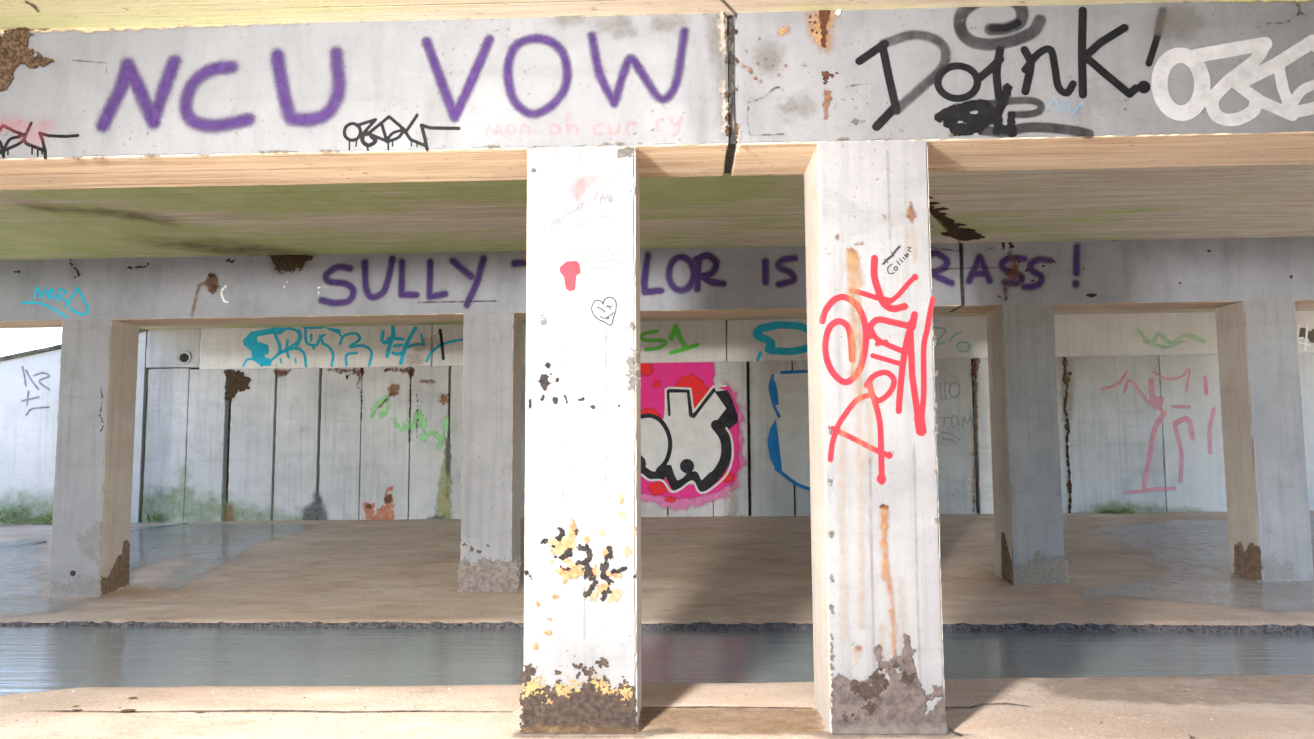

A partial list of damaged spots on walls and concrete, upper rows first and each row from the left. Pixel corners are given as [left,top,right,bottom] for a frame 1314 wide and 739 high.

corrosion [809,10,841,50]
spalling [0,27,53,91]
corrosion [821,71,838,118]
spalling [251,254,313,288]
spalling [224,369,251,402]
peeling [457,542,532,592]
corrosion [879,504,895,654]
peeling [1233,542,1263,582]
peeling [519,493,638,734]
peeling [829,633,948,735]